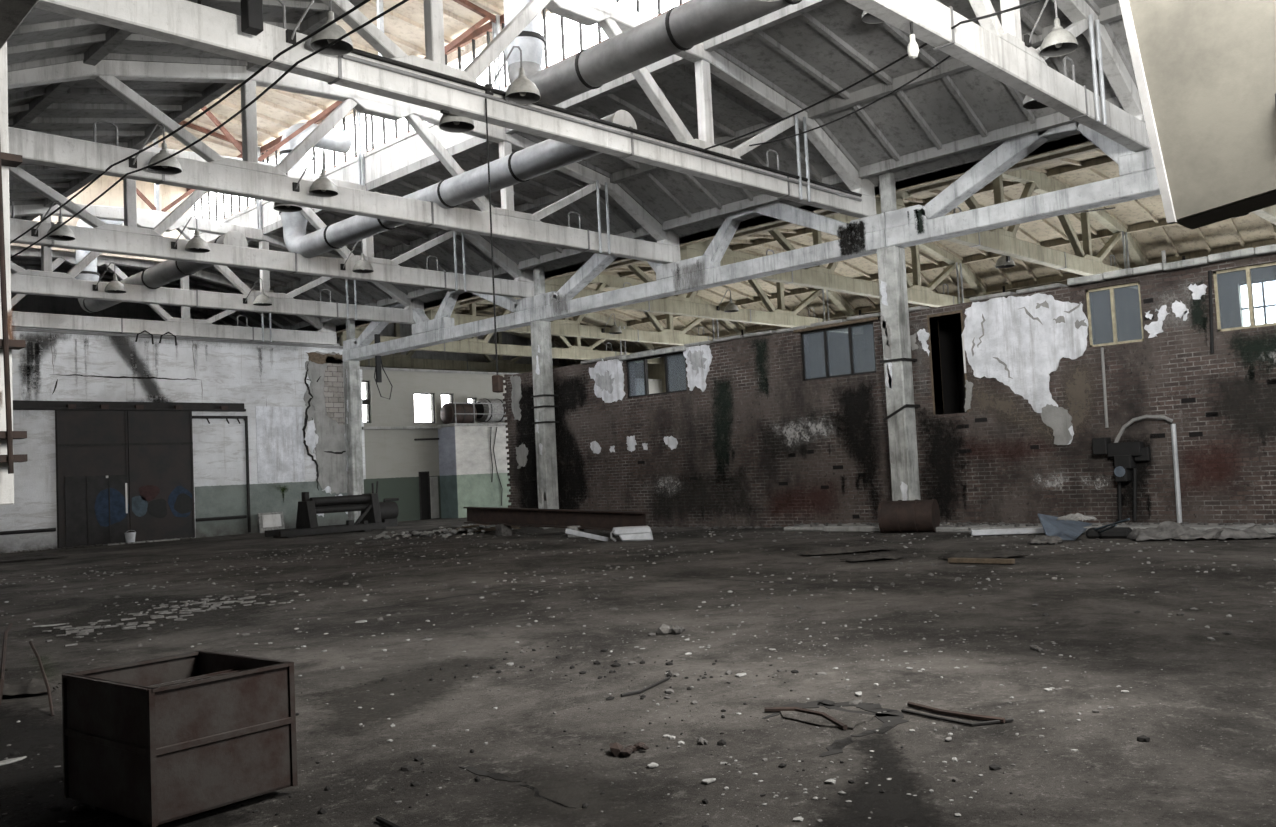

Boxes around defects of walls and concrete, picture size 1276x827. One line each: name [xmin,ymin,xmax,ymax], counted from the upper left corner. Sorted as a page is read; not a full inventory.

mould [837,221,866,256]
peeling [1143,279,1207,338]
peeling [589,359,626,403]
peeling [683,345,713,392]
peeling [910,328,930,356]
peeling [957,293,1089,445]
spalling [302,351,349,496]
damp [653,378,753,520]